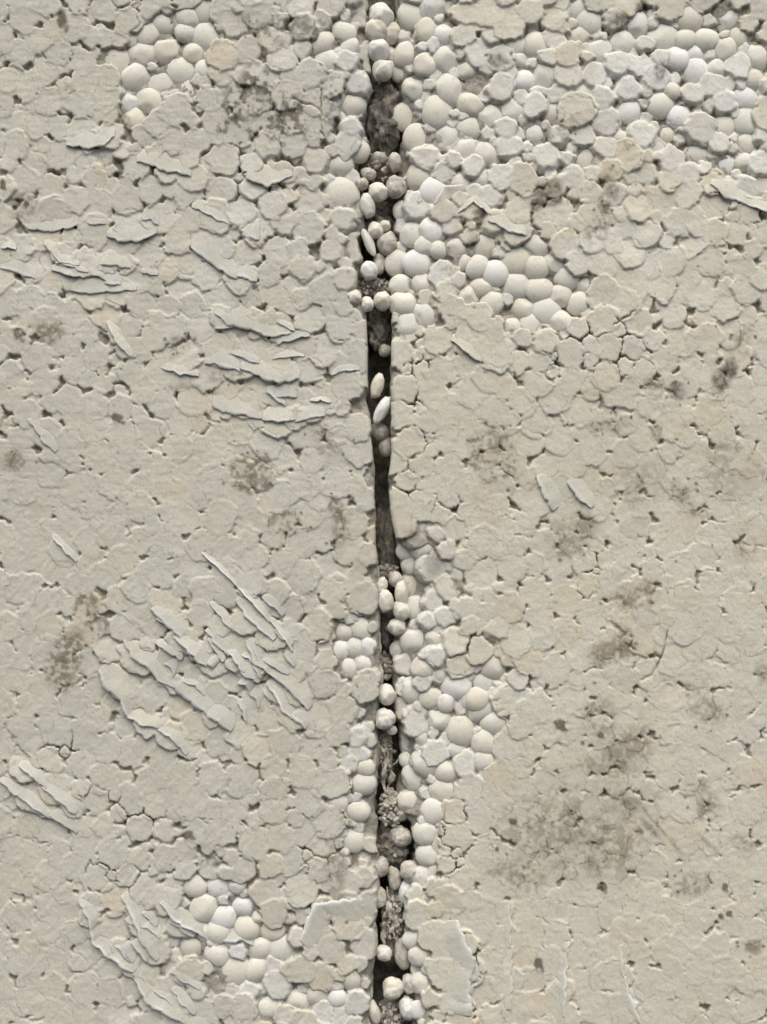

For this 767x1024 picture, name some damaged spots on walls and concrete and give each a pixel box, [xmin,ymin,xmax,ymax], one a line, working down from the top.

peeling [66,126,115,149]
peeling [136,149,192,176]
peeling [246,164,293,188]
spalling [569,0,767,212]
peeling [27,209,159,294]
peeling [107,320,133,357]
peeling [161,304,331,423]
crack [545,313,651,372]
peeling [123,552,313,732]
peeling [98,662,190,756]
peeling [0,760,79,834]
spalling [78,875,365,1024]